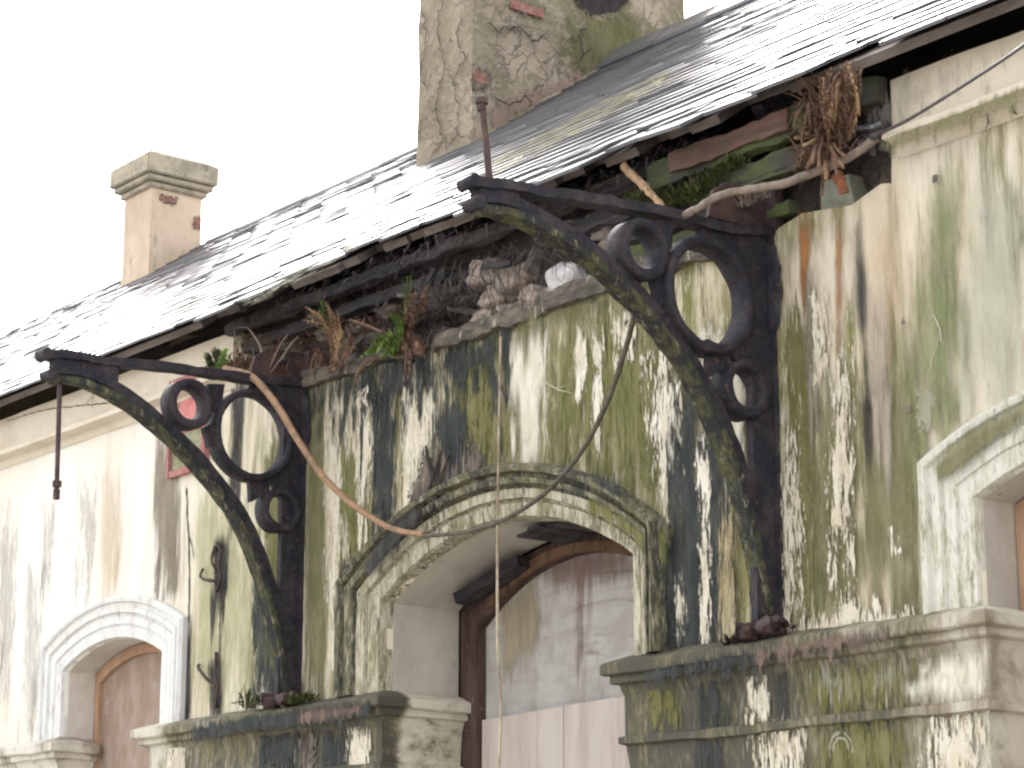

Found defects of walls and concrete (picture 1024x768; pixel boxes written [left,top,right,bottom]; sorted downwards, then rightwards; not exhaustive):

crack [414,0,465,159]
crack [487,22,546,53]
crack [492,81,547,116]
spalling [157,192,179,207]
rust [800,223,810,307]
leakage [154,439,180,596]
peeling [322,378,375,696]
leakage [306,294,623,577]
peeling [507,323,549,463]
leakage [542,382,923,768]
leakage [784,222,891,488]
peeling [778,284,916,632]